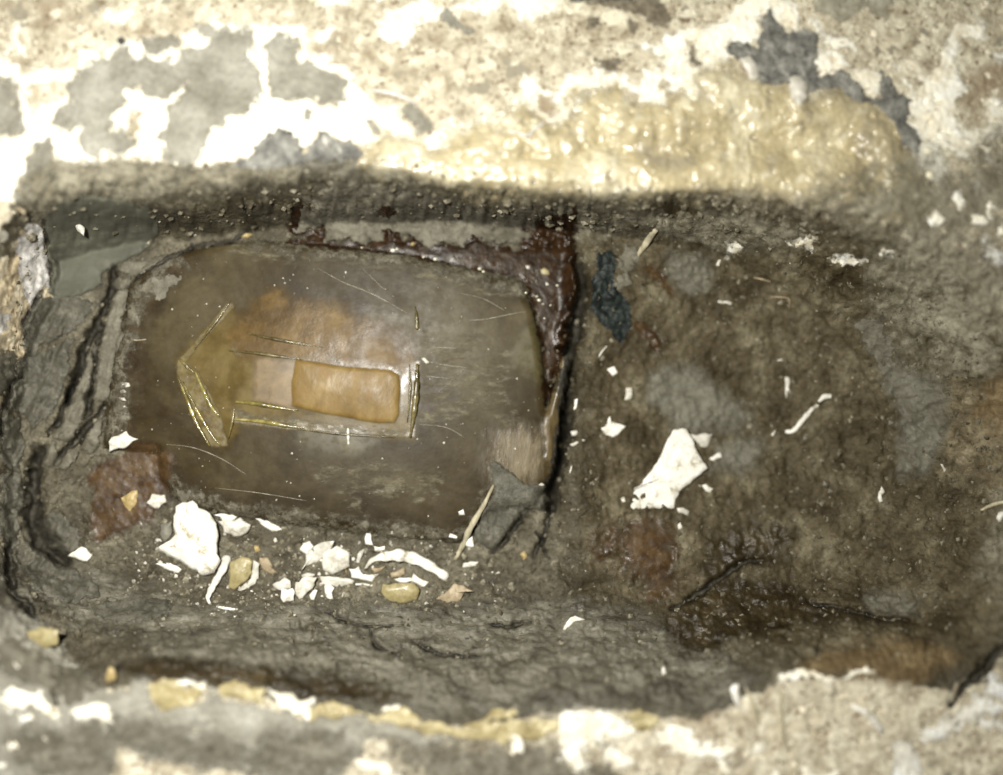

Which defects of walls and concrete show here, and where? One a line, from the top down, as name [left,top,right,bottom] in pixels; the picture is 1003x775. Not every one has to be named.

peeling [0,19,244,203]
leakage [51,23,349,170]
leakage [233,126,363,173]
peeling [192,20,504,169]
peeling [509,0,882,126]
leakage [864,127,1003,512]
crack [4,219,255,618]
spalling [0,159,1003,727]
crack [491,266,588,559]
crack [669,558,765,611]
leakage [0,665,560,775]
crack [948,647,1003,708]